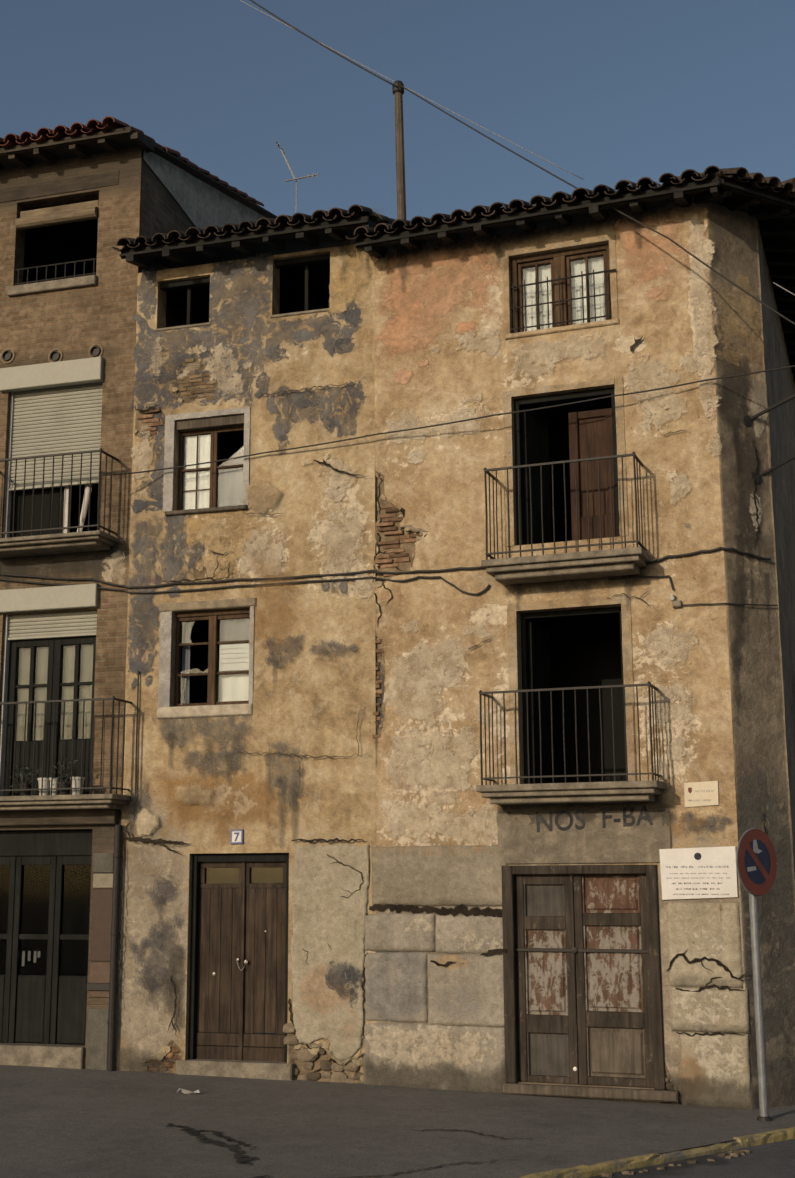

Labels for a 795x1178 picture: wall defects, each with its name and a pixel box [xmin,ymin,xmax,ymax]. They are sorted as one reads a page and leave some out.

peeling [102,240,495,689]
crack [314,459,429,628]
crack [124,819,192,854]
crack [292,838,502,918]
damp [130,917,182,1026]
crack [167,976,178,1041]
damp [325,963,360,999]
crack [430,949,506,967]
crack [666,950,748,992]
flaking render [147,1040,183,1073]
flaking render [283,1023,365,1084]